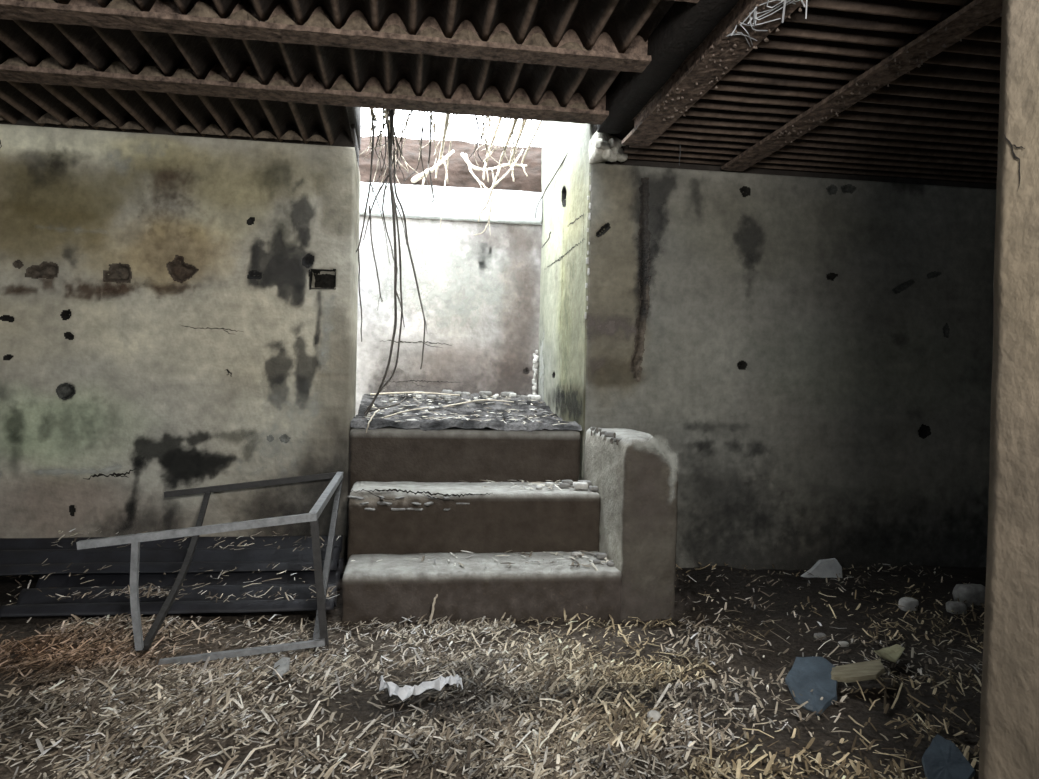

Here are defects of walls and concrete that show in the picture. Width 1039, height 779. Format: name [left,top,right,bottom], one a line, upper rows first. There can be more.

leakage [635,176,675,283]
leakage [250,198,314,305]
spalling [12,260,59,279]
spalling [103,263,132,284]
spalling [166,255,199,283]
leakage [266,292,320,399]
spalling [590,427,622,445]
leakage [134,432,235,487]
spalling [347,496,470,511]